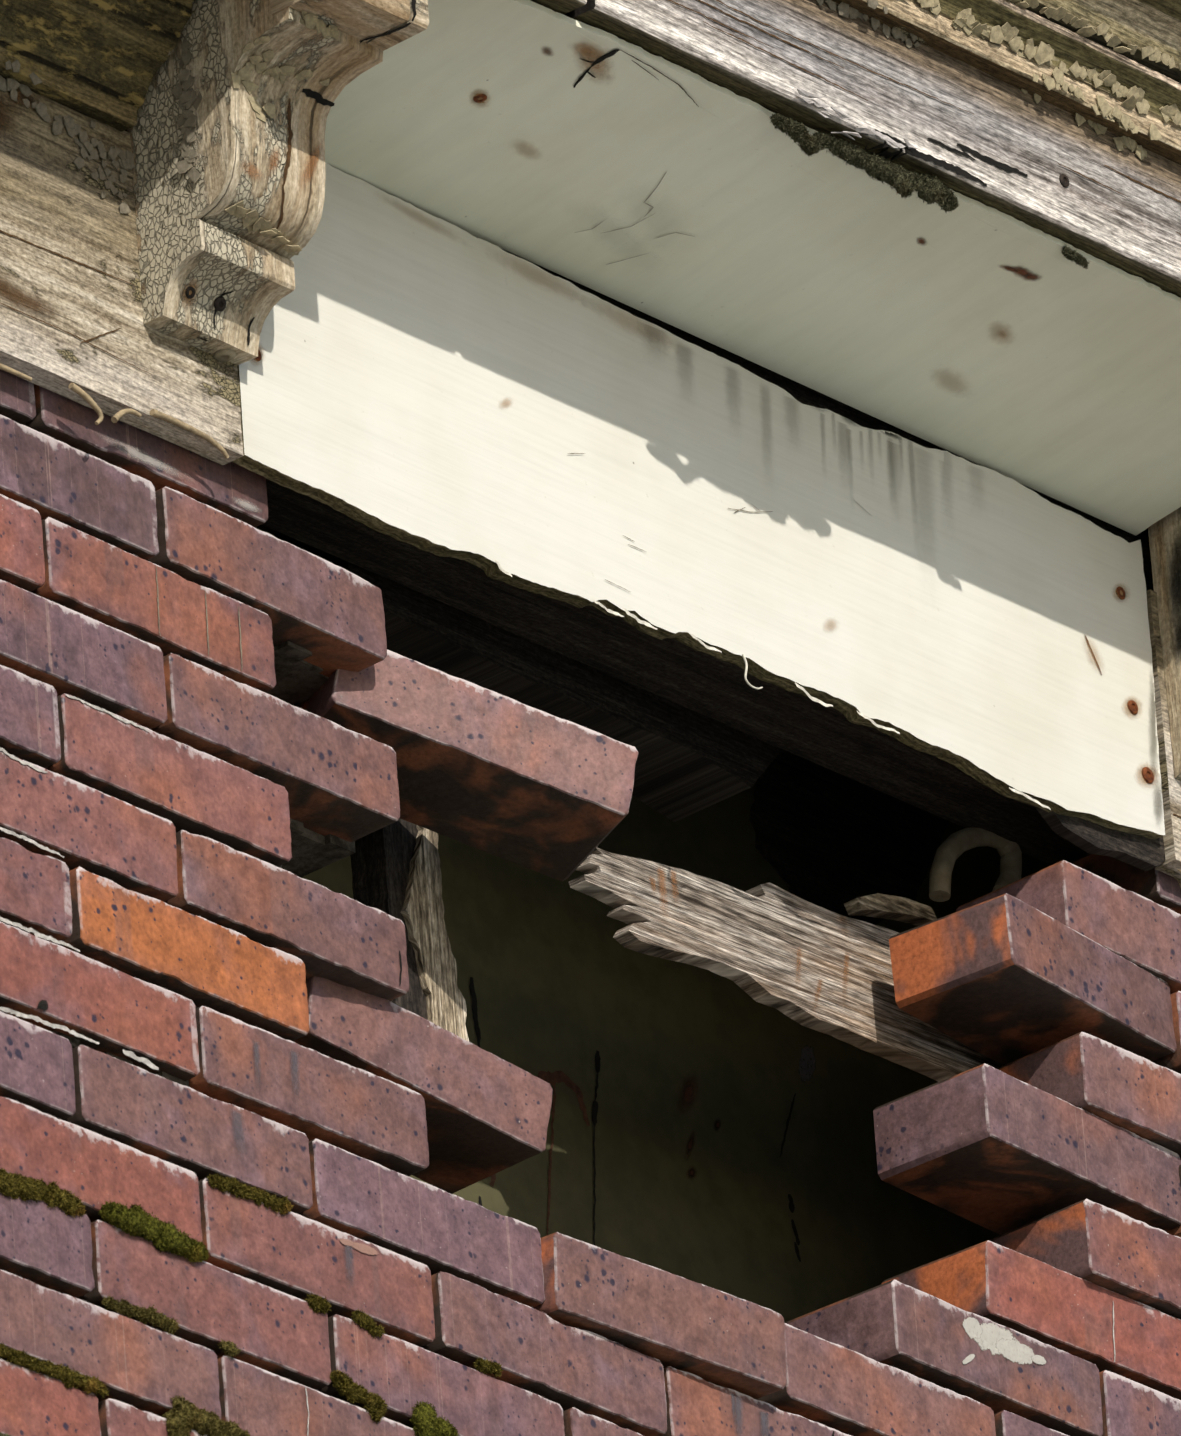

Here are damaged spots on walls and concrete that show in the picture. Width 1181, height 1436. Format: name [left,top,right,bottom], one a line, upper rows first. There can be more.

crack [360,0,416,43]
crack [573,49,699,107]
peeling [816,0,1181,160]
crack [277,88,335,230]
corrosion [1003,266,1039,280]
crack [197,290,255,345]
flaking render [749,750,949,925]
spalling [340,1239,378,1255]